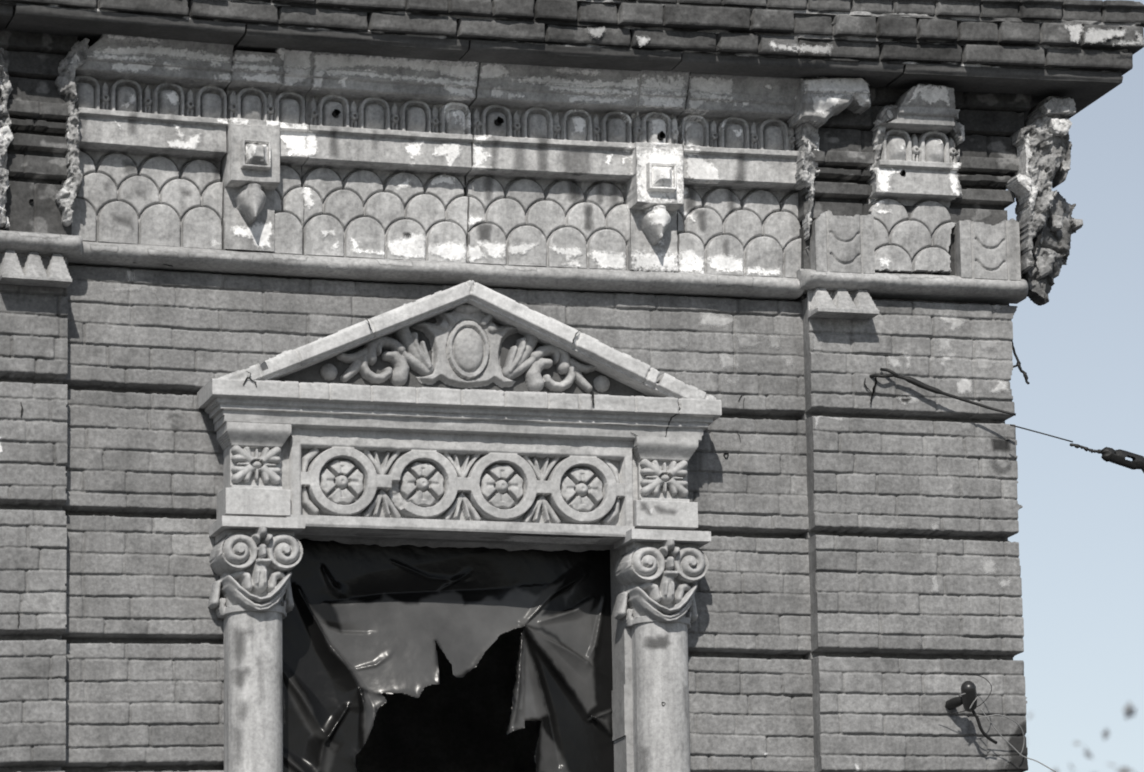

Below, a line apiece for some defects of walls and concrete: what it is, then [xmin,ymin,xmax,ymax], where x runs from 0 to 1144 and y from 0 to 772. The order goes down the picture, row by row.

peeling [0,34,781,287]
spalling [793,77,965,249]
spalling [1005,96,1083,306]